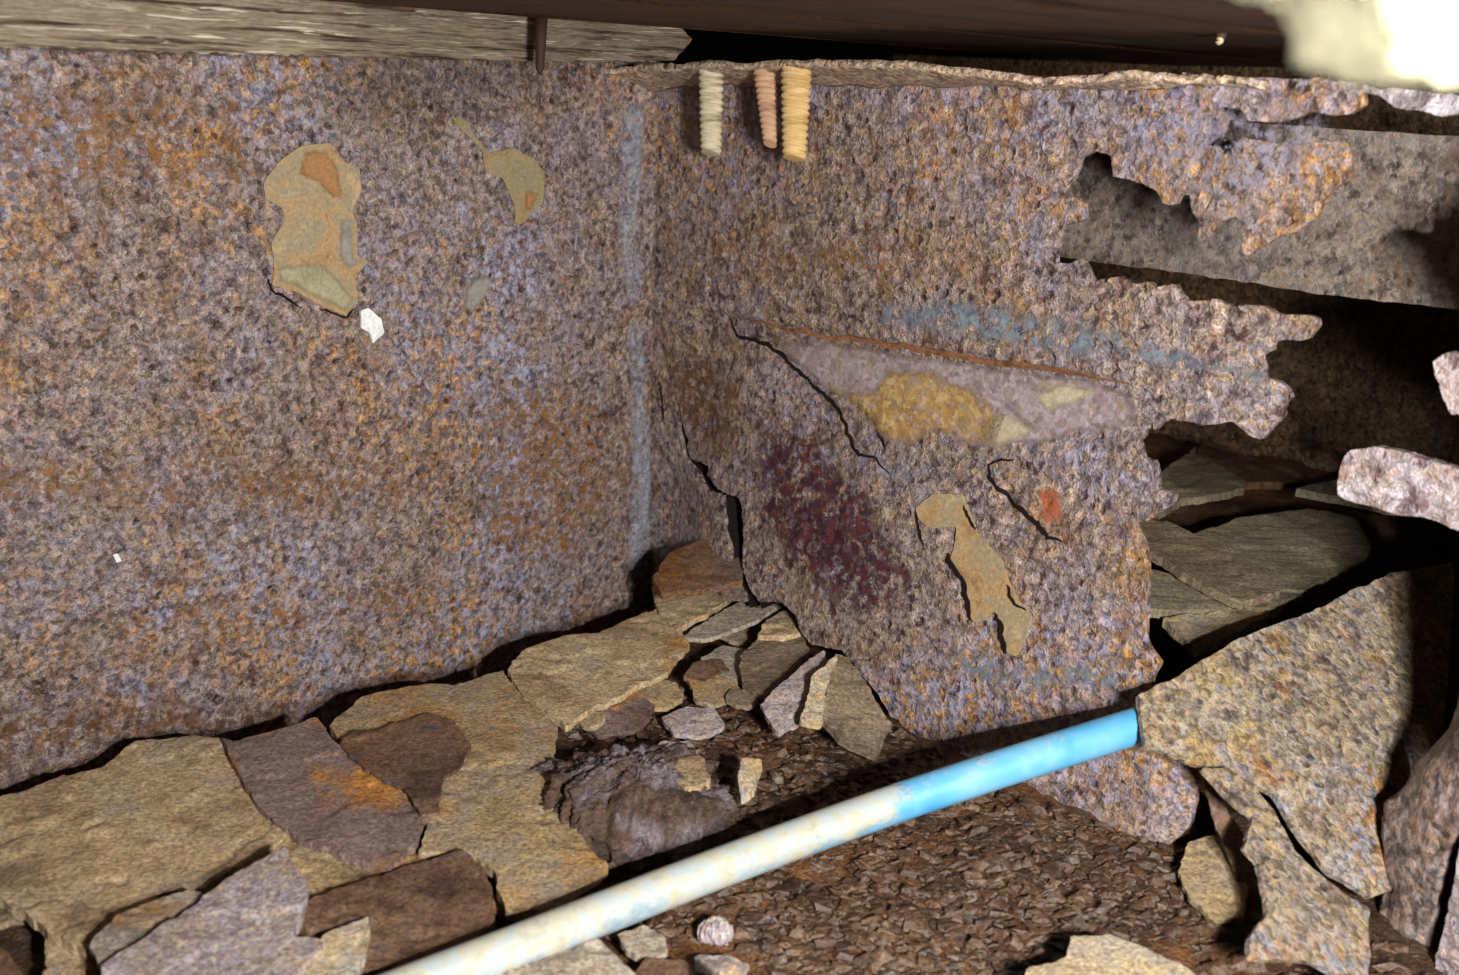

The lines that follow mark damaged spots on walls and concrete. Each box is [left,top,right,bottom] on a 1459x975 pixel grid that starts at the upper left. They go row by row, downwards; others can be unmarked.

rust [0,94,247,188]
peeling [452,118,545,225]
peeling [263,143,384,343]
rust [672,351,734,448]
rust [0,463,200,509]
rust [220,471,375,511]
rust [489,379,608,561]
crack [659,381,778,609]
rust [759,431,907,609]
spalling [915,493,1032,656]
crack [938,430,1064,543]
rust [0,703,210,768]